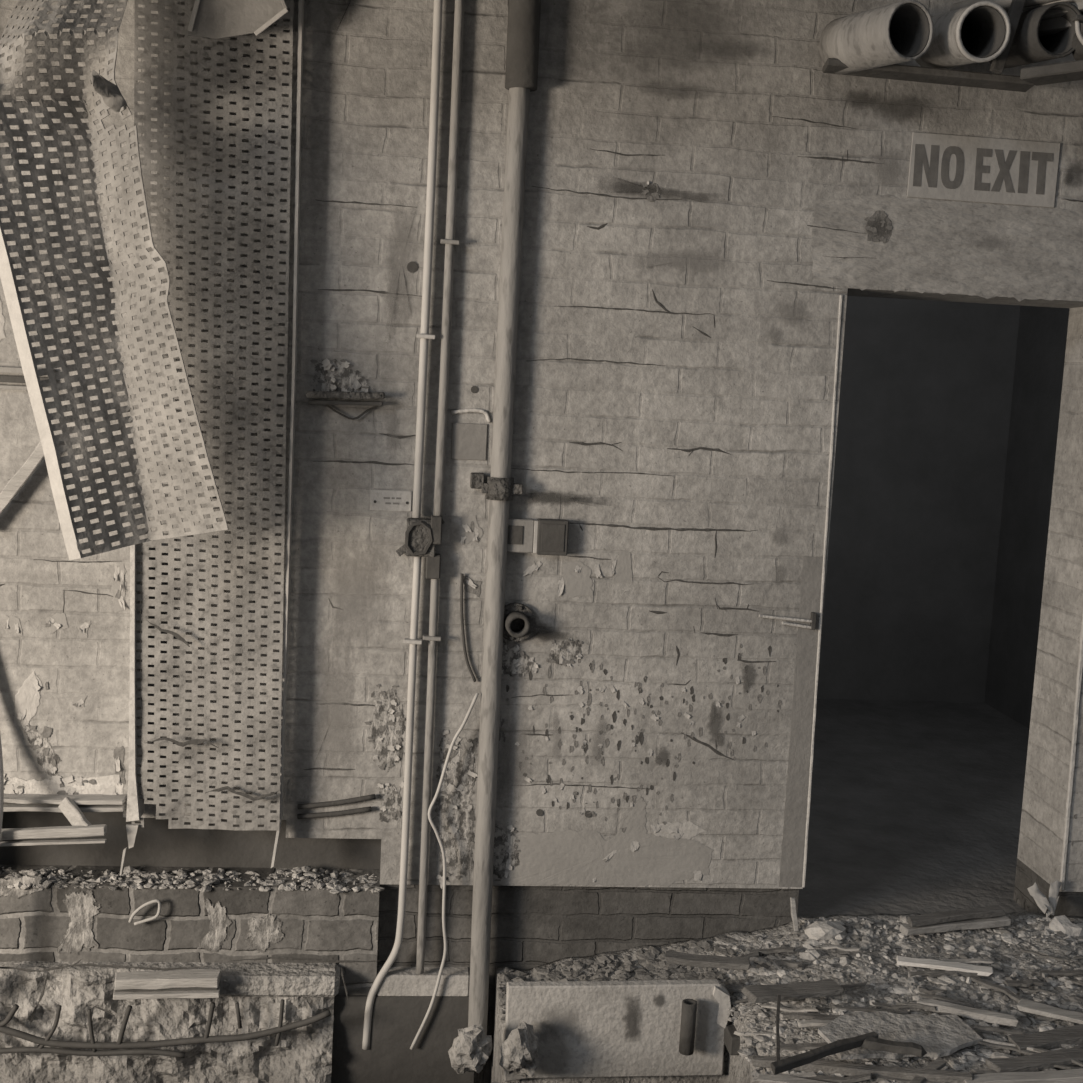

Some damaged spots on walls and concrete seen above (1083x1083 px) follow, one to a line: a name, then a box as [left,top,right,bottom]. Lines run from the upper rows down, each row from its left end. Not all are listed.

crack [558,289,715,338]
peeling [4,671,125,795]
spalling [365,684,405,770]
spalling [499,638,782,840]
crack [682,733,734,760]
spalling [376,781,404,822]
spalling [432,730,478,889]
spalling [493,825,520,881]